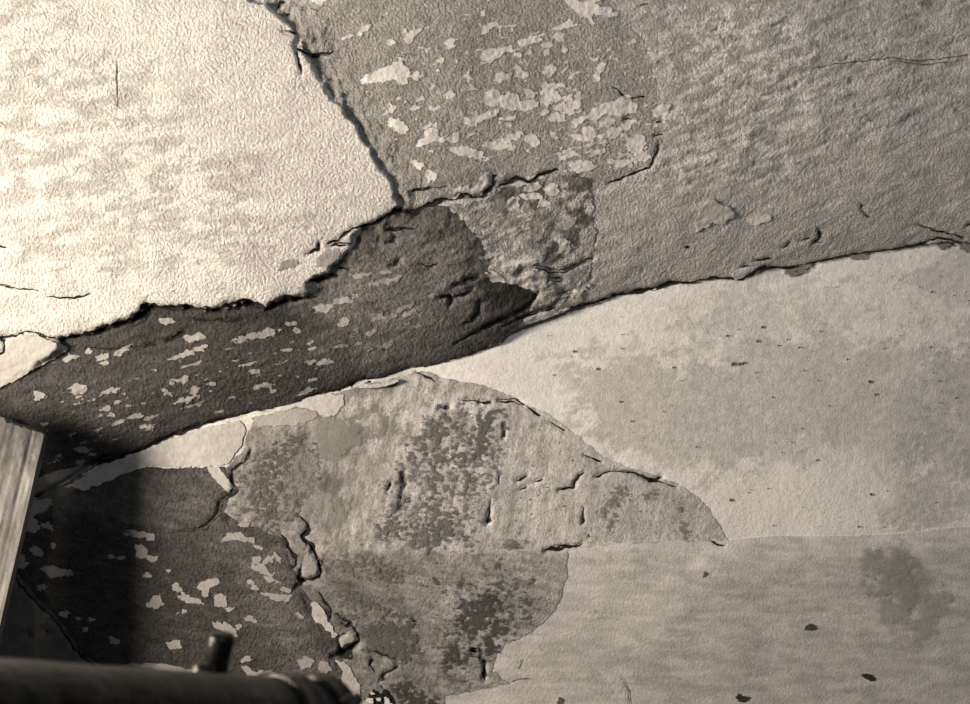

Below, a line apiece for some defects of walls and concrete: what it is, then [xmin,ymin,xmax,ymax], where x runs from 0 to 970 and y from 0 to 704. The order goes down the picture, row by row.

crack [0,168,558,355]
peeling [0,0,671,478]
crack [299,224,970,402]
crack [34,408,274,497]
crack [387,475,406,507]
crack [441,398,564,431]
spalling [17,466,358,680]
water stain [859,543,952,647]
spalling [366,689,394,704]